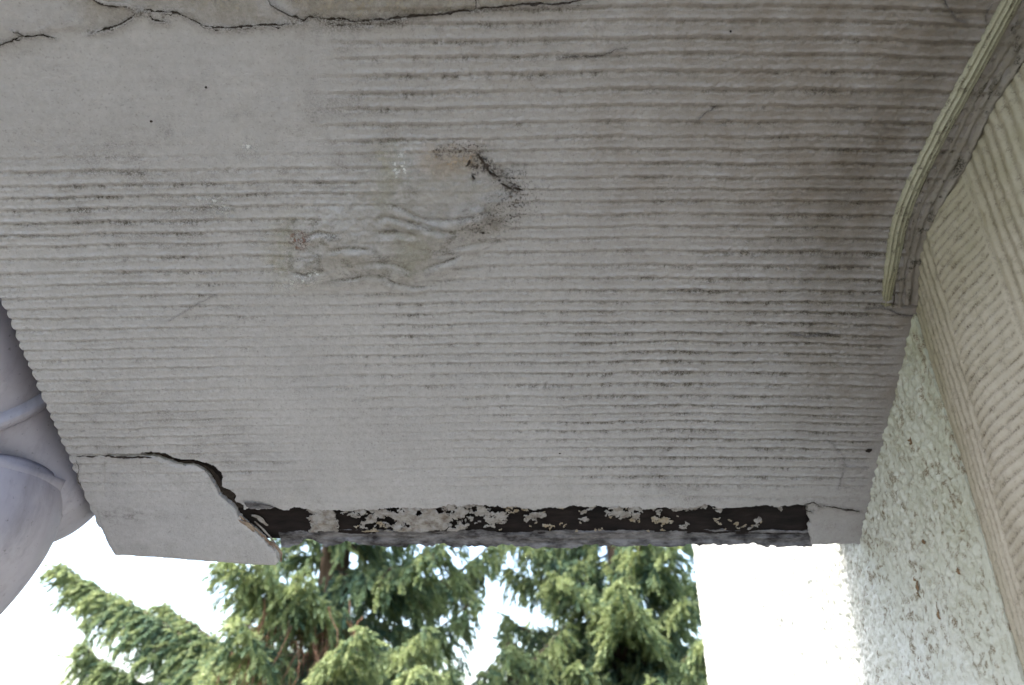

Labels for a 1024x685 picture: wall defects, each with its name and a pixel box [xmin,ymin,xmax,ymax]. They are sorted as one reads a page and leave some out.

crack [0,32,54,46]
crack [93,0,581,32]
crack [76,452,244,508]
flaking render [96,452,806,565]